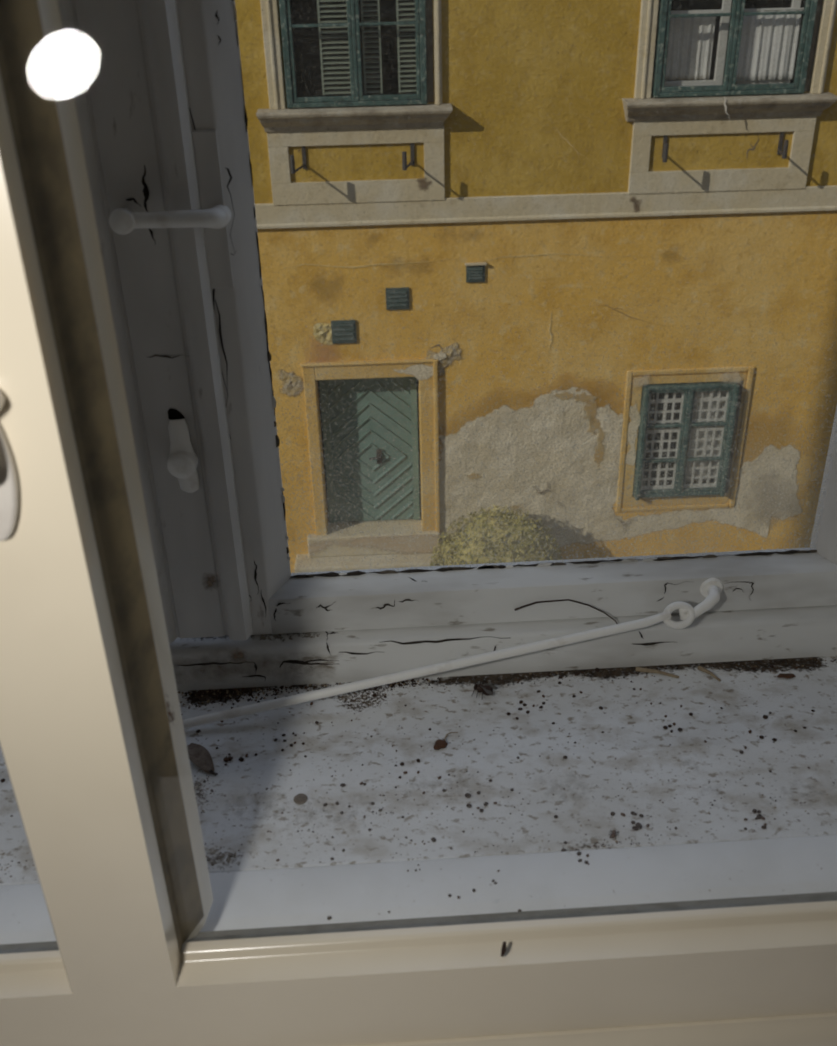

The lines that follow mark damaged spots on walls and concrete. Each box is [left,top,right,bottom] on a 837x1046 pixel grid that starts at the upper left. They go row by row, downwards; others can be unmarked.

crack [126,165,155,241]
spalling [394,343,461,380]
peeling [439,387,802,547]
peeling [291,550,817,578]